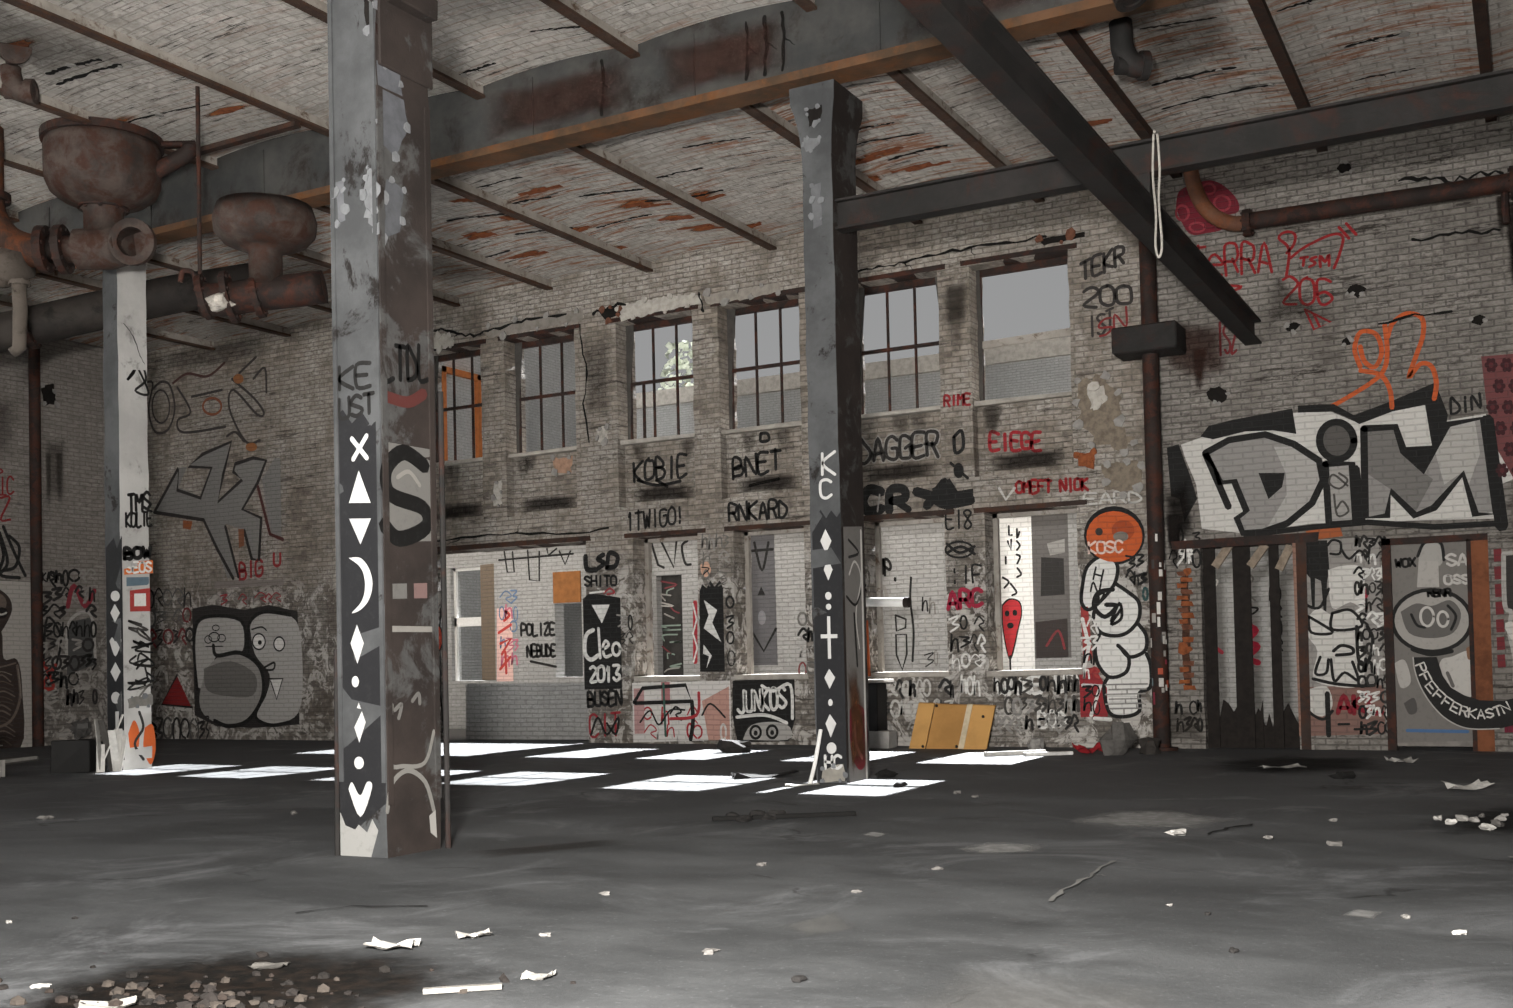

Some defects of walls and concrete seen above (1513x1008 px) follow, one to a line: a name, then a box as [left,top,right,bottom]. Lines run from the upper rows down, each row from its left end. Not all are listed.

corrosion [675,26,769,86]
corrosion [502,71,615,128]
peeling [332,60,411,245]
corrosion [856,147,951,182]
corrosion [461,215,518,241]
corrosion [518,185,563,196]
corrosion [618,190,726,232]
corrosion [507,250,549,259]